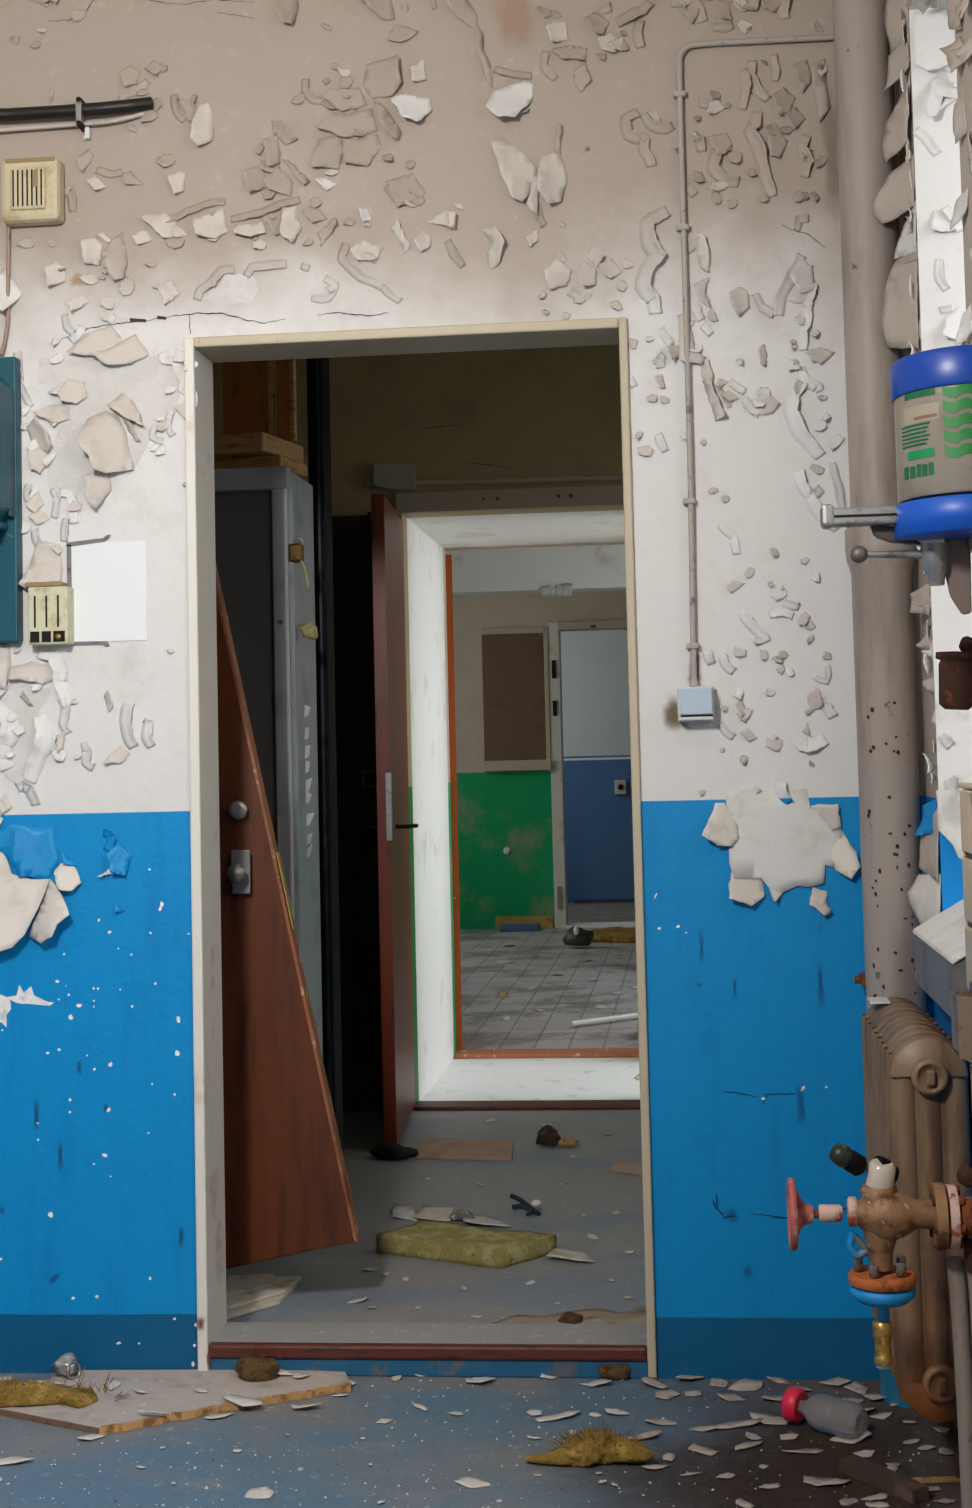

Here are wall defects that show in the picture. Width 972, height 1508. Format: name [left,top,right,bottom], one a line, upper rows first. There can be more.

peeling [429,0,790,117]
peeling [0,270,22,311]
peeling [10,0,466,589]
peeling [491,123,567,247]
peeling [538,205,846,532]
peeling [872,0,972,355]
peeling [703,521,837,767]
peeling [909,572,934,693]
peeling [0,643,156,951]
peeling [698,781,861,916]
peeling [907,711,972,925]
spalling [0,980,99,1031]